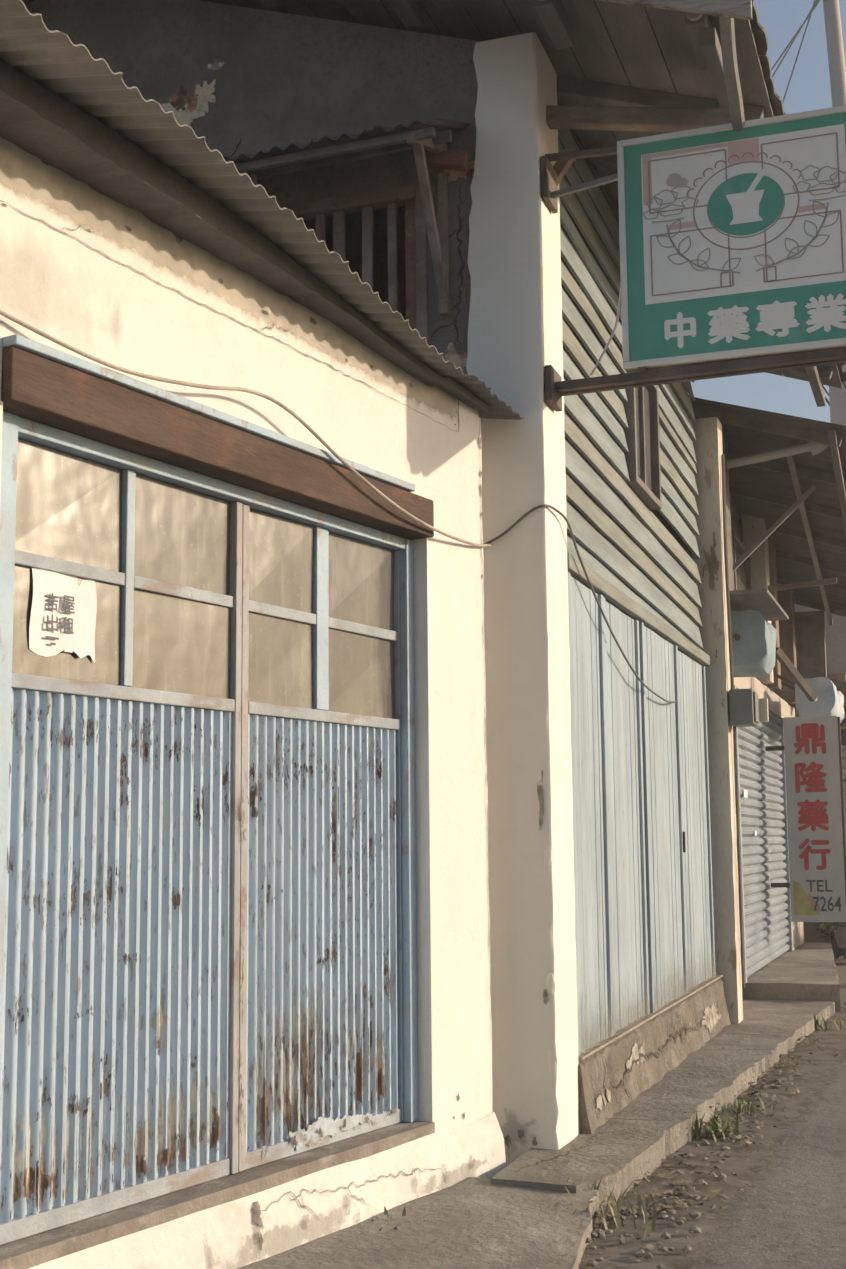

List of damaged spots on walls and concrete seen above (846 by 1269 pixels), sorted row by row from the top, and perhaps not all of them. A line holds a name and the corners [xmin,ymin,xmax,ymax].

flaking render [160,59,227,127]
rust [209,1017,310,1154]
rust [348,1031,385,1111]
spalling [626,1041,647,1071]
spalling [701,1002,721,1032]
rust [13,1122,53,1205]
rust [134,1097,180,1176]
crack [258,1164,447,1221]